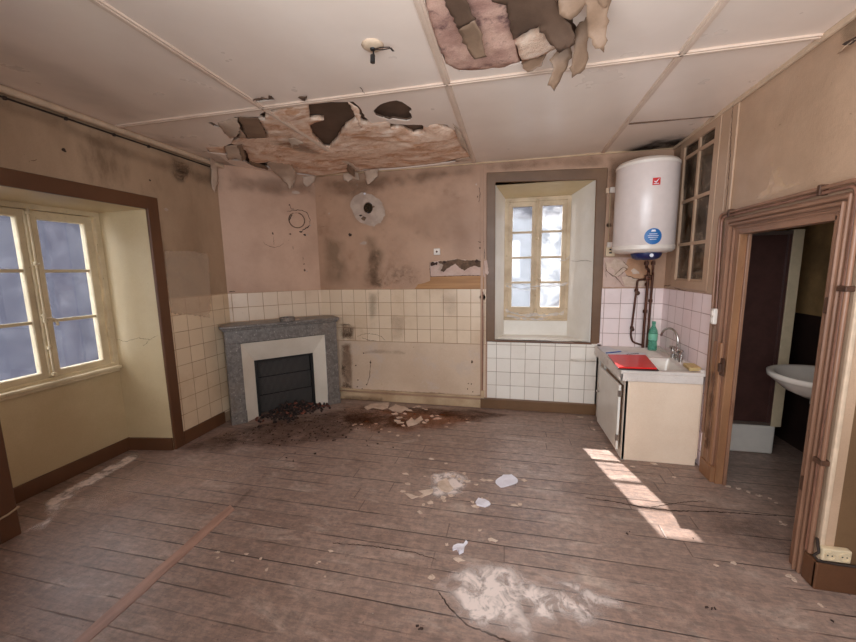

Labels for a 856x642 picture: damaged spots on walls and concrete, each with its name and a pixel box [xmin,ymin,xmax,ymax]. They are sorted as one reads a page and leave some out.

spalling [430,258,485,277]